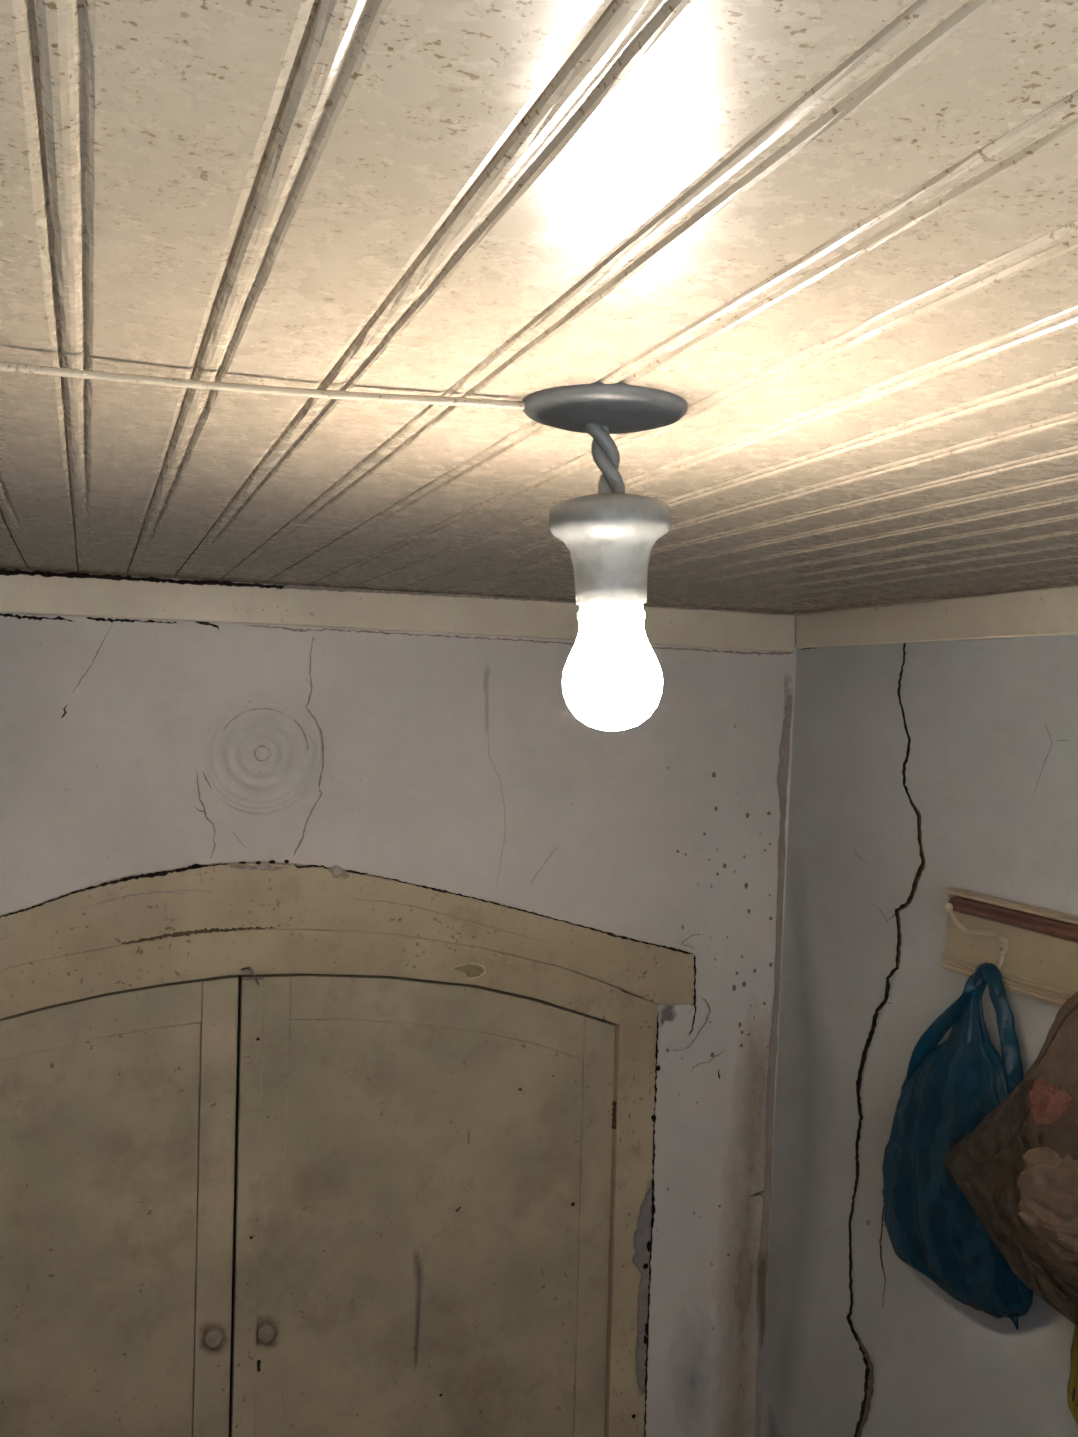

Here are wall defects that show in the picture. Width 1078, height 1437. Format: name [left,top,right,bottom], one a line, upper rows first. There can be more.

crack [0,613,696,1007]
crack [651,647,817,655]
crack [632,1013,724,1437]
crack [846,643,925,1437]